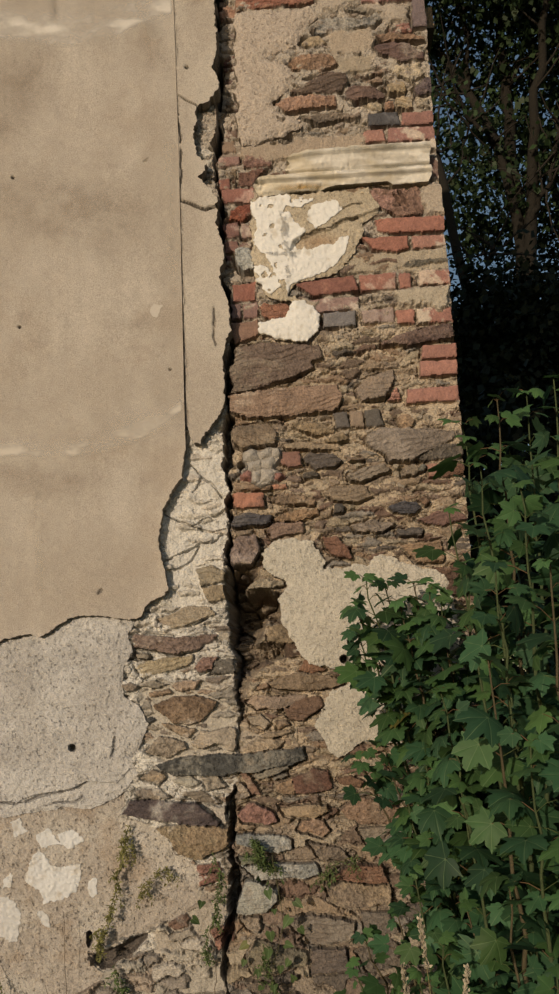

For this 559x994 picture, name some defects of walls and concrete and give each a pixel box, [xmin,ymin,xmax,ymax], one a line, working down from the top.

crack [174,0,228,425]
crack [164,285,236,572]
crack [0,781,88,807]
spalling [0,288,305,994]
crack [188,785,242,994]
crack [236,696,246,735]